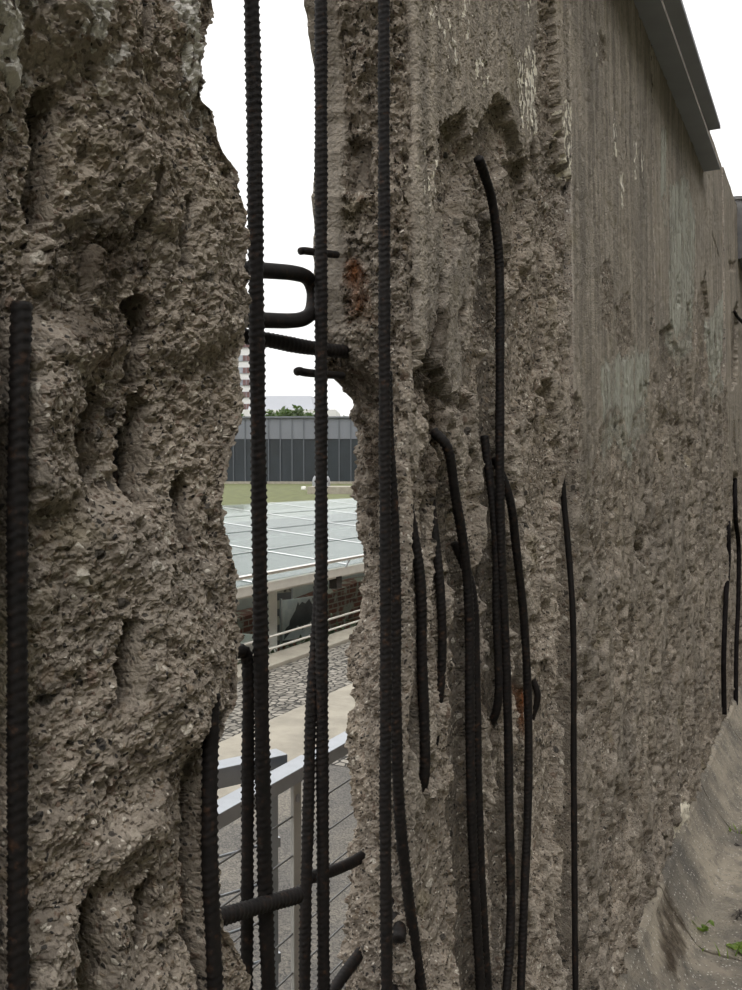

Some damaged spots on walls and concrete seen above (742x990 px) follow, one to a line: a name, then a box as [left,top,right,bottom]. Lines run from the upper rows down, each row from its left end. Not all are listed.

peeling [0,0,33,134]
peeling [79,0,131,69]
peeling [168,0,209,129]
spalling [112,428,120,487]
spalling [200,0,366,990]
spalling [347,0,579,990]
spalling [5,301,33,990]